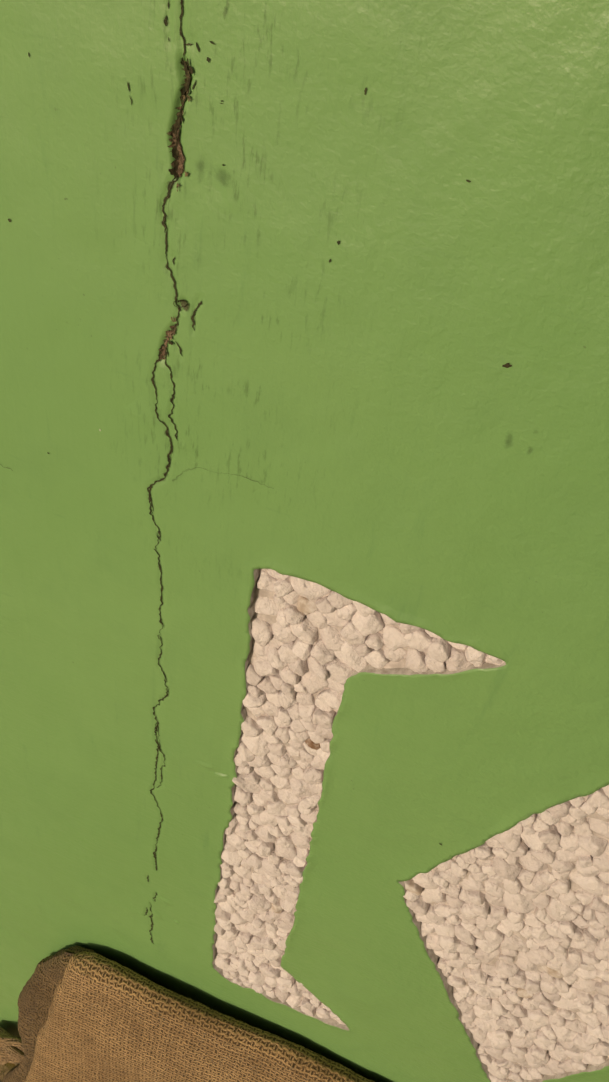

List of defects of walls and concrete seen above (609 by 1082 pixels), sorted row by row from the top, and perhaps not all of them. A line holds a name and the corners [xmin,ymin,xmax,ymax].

crack [144,0,216,944]